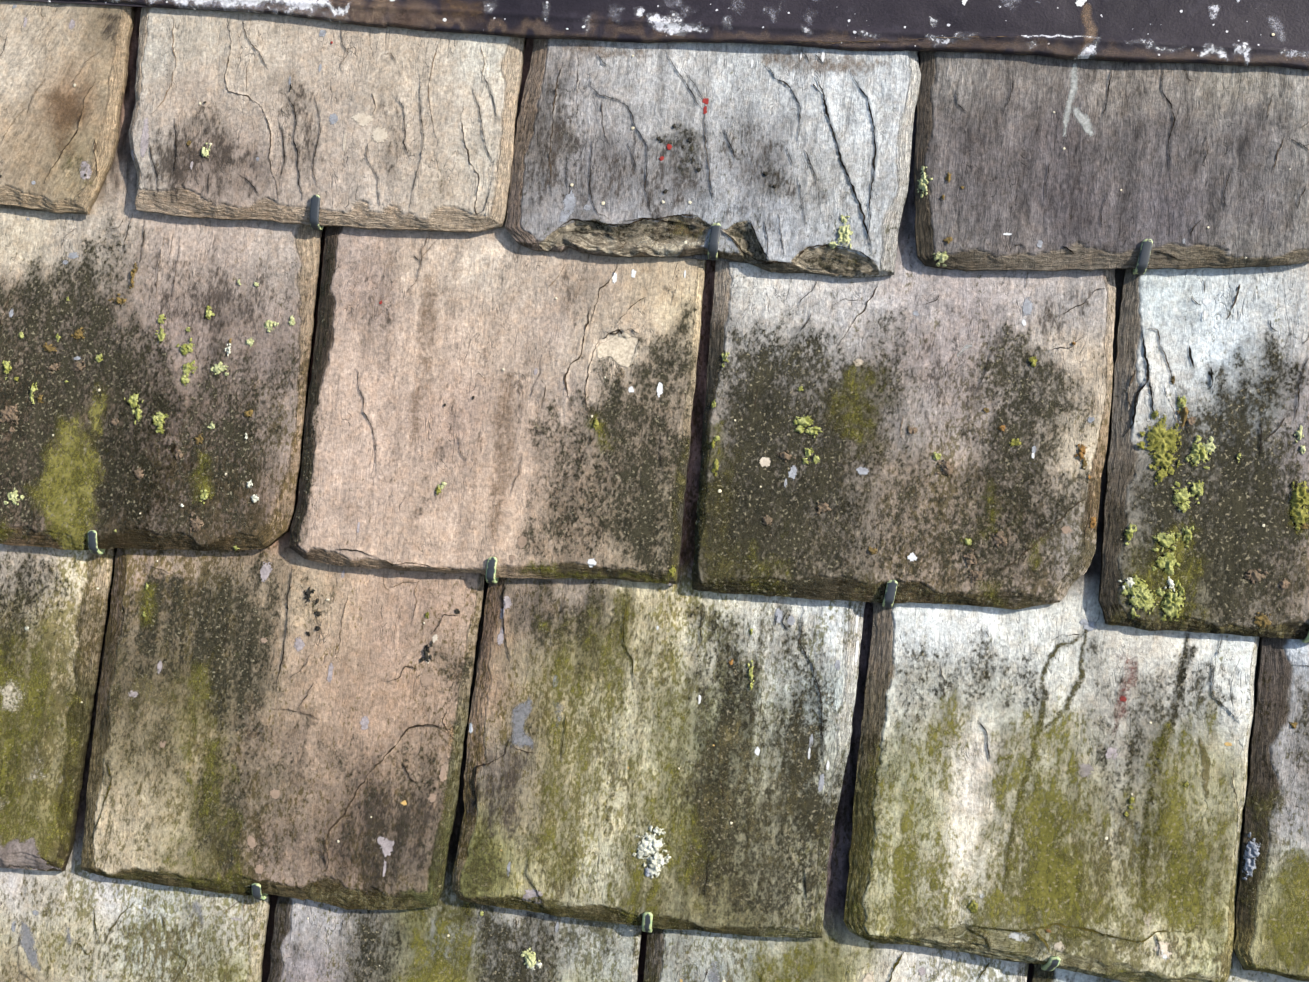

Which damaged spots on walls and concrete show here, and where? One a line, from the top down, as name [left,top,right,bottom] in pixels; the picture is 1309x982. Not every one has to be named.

water stain [174,0,350,22]
water stain [615,0,707,35]
water stain [1200,42,1251,65]
crack [149,19,177,187]
crack [224,20,321,195]
crack [366,49,496,214]
spalling [539,189,767,263]
crack [518,36,1021,414]
spalling [791,244,879,277]
water stain [88,391,107,437]
water stain [1042,633,1087,732]
water stain [429,920,463,958]